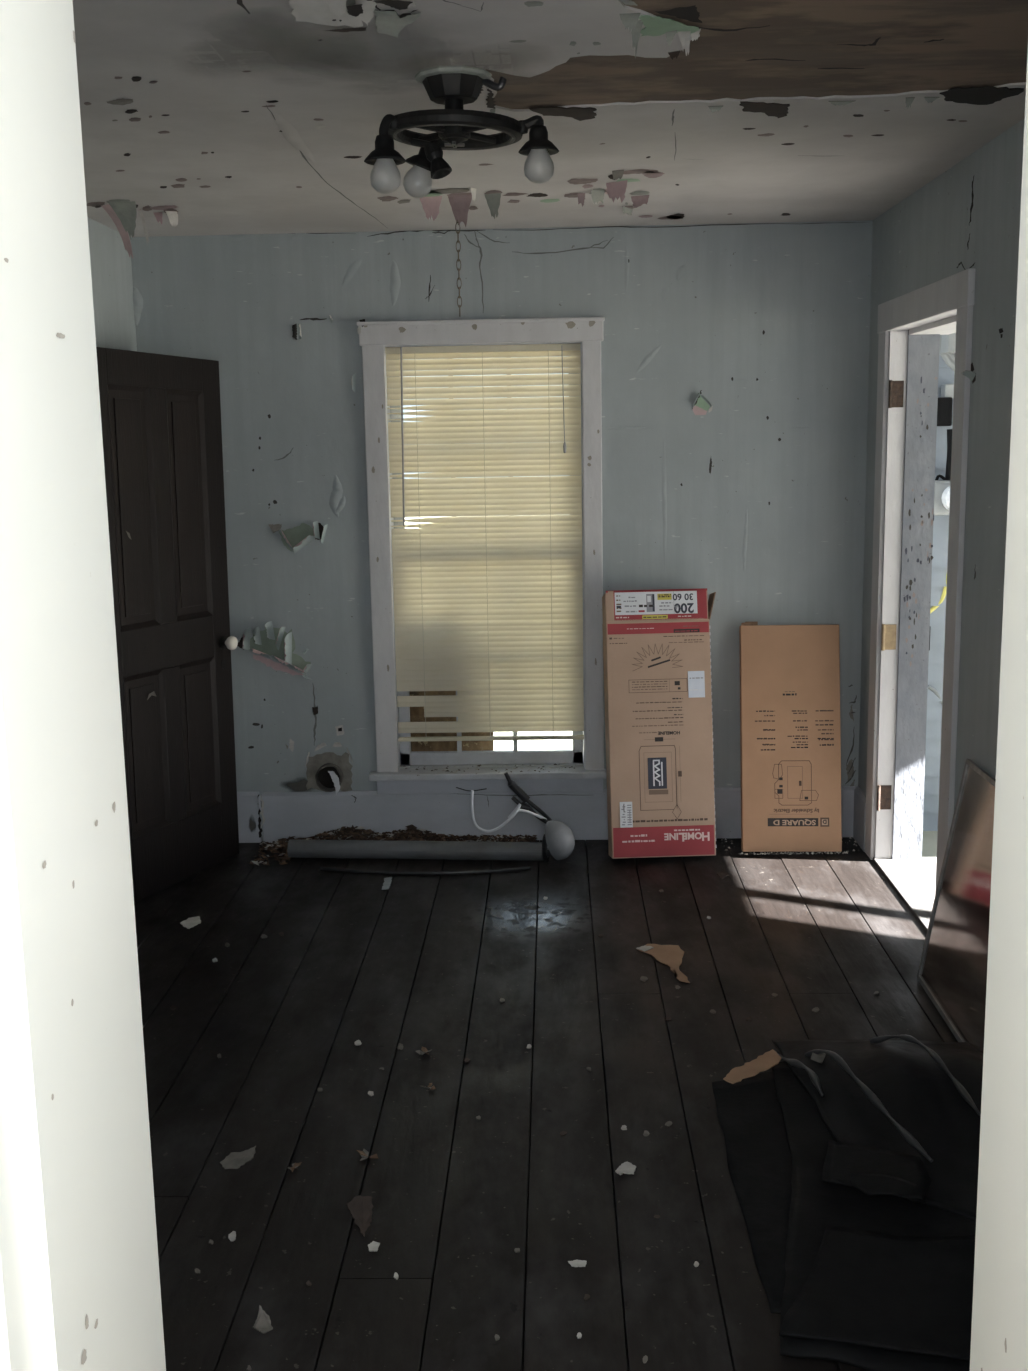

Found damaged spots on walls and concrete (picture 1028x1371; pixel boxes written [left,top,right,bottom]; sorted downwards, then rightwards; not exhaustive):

peeling [289,0,421,41]
flaking render [478,0,1028,145]
peeling [160,176,232,188]
peeling [378,156,684,227]
peeling [87,199,178,258]
crack [957,176,975,270]
peeling [268,521,328,554]
peeling [237,621,312,679]
crack [311,685,319,746]